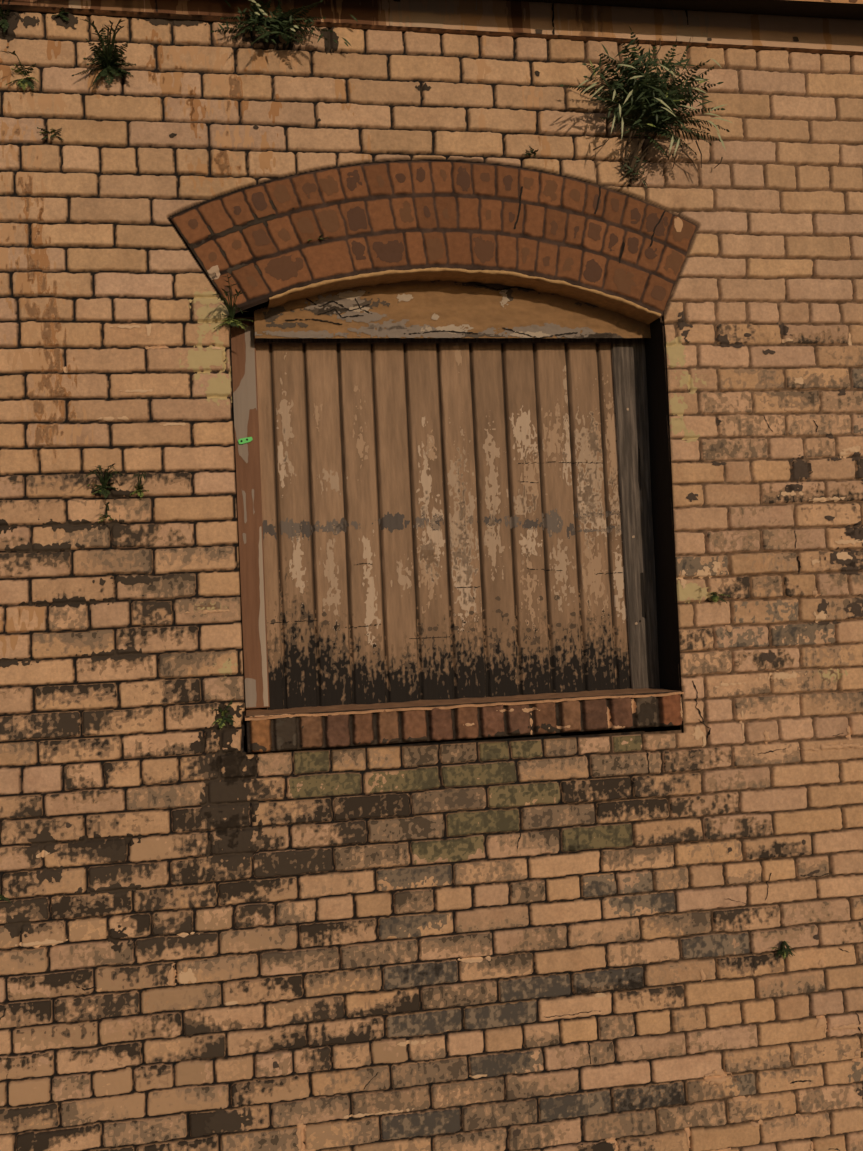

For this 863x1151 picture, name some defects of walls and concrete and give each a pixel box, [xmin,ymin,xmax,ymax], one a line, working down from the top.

water stain [389,0,464,30]
peeling [276,352,297,496]
peeling [317,468,348,495]
peeling [233,290,596,469]
peeling [390,365,627,647]
peeling [289,524,343,645]
peeling [359,530,381,648]
water stain [248,556,631,752]
water stain [561,748,804,859]
water stain [0,679,410,1077]
mould [717,953,781,969]
water stain [0,1103,101,1151]